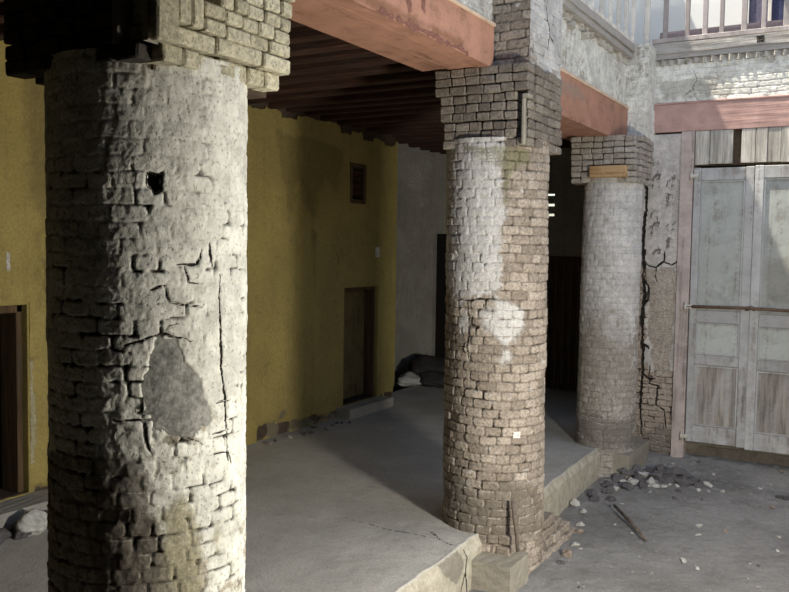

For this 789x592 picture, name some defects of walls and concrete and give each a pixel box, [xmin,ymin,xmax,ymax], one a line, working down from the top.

spalling [135,172,164,195]
crack [112,418,152,453]
spalling [141,336,212,440]
crack [124,243,231,462]
crack [639,186,677,435]